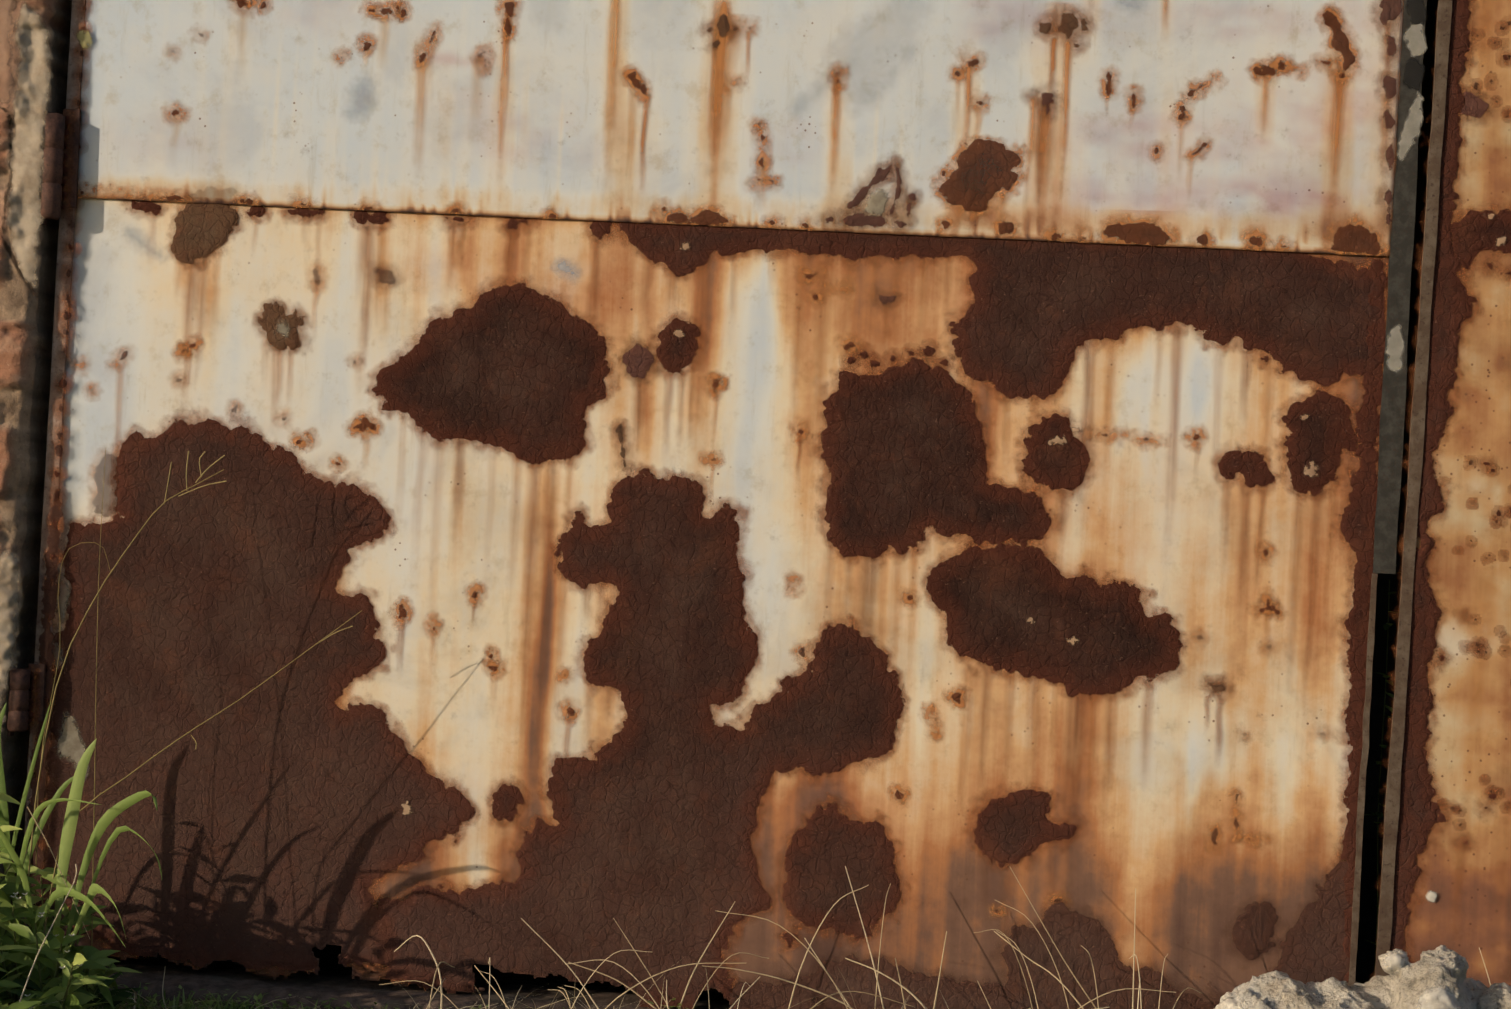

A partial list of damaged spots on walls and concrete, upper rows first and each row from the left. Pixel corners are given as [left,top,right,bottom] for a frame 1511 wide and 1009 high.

corrosion [236,0,266,13]
corrosion [335,35,376,64]
corrosion [366,1,407,22]
corrosion [416,27,439,67]
corrosion [476,0,518,95]
corrosion [1379,0,1402,171]
corrosion [77,183,325,268]
corrosion [348,279,704,467]
corrosion [589,0,1393,985]
corrosion [1390,0,1511,963]
corrosion [27,405,1220,1009]